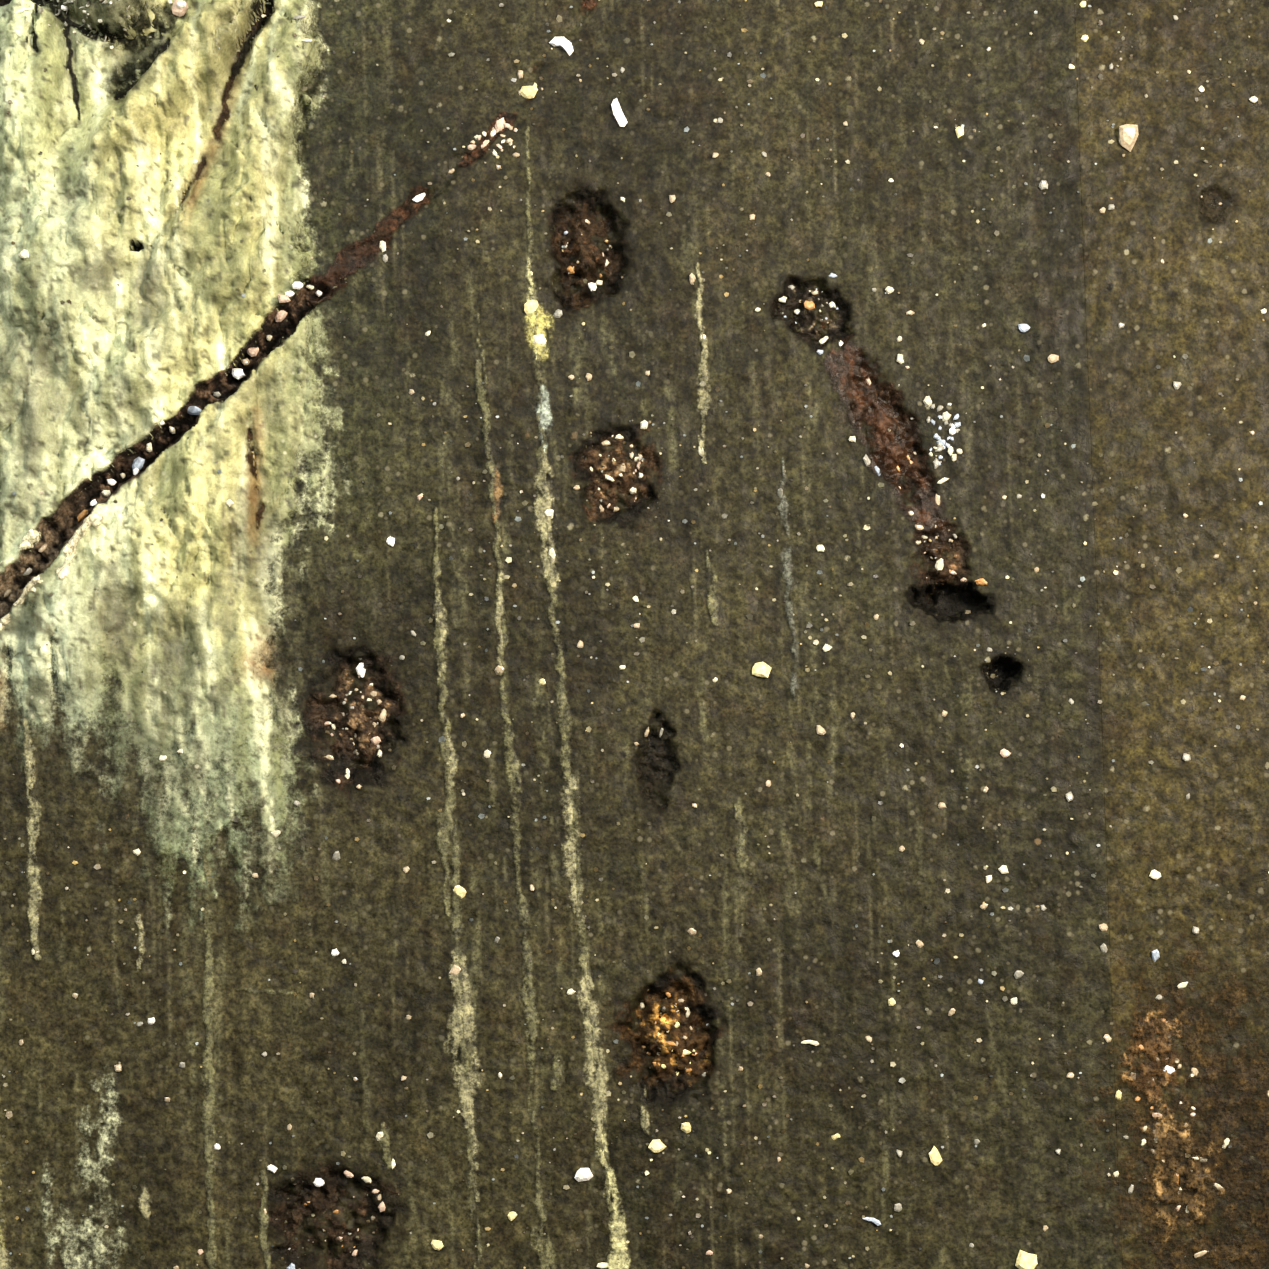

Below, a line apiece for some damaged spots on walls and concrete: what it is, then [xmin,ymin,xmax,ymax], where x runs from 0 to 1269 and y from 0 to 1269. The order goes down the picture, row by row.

damp [0,0,329,573]
damp [0,310,342,1269]
crack [0,70,543,630]
damp [376,1122,396,1169]
efflorescence [433,507,482,1269]
damp [475,314,556,1269]
damp [524,126,630,1269]